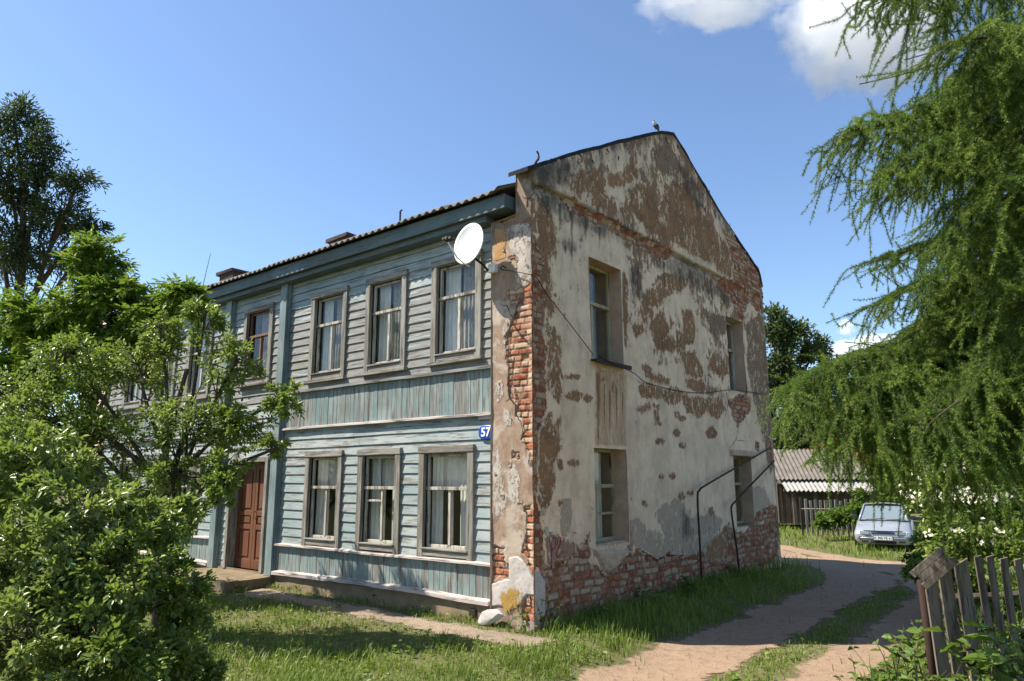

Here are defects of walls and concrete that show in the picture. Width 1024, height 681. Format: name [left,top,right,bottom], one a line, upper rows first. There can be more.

flaking render [492,196,779,630]
peeling [562,145,773,472]